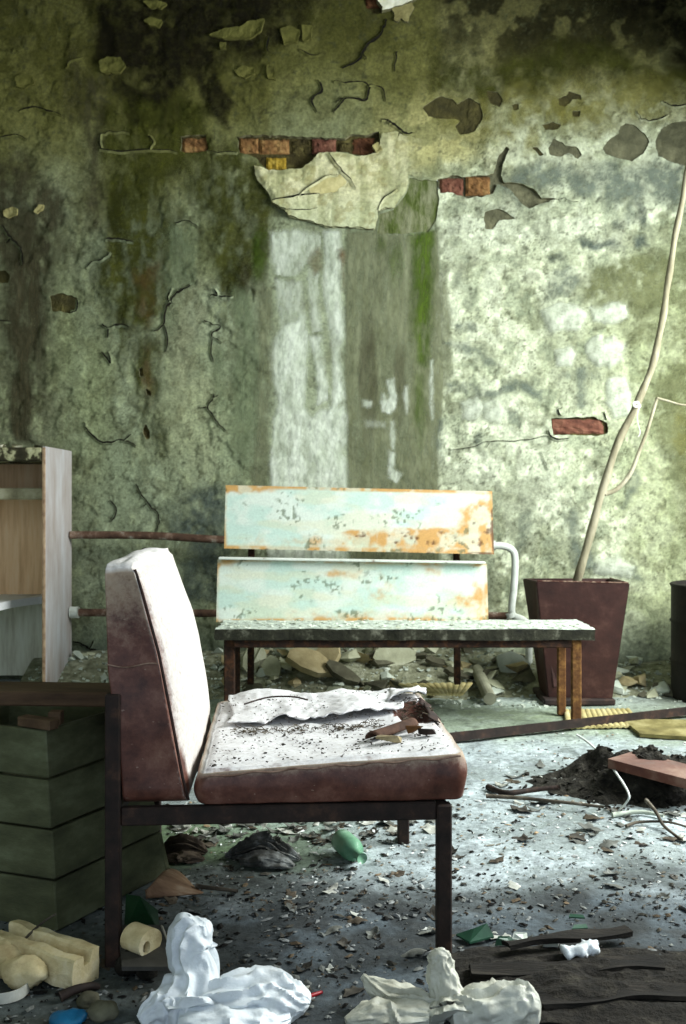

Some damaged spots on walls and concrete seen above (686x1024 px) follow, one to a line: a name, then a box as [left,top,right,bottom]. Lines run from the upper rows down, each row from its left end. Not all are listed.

leakage [97,0,308,128]
crack [264,19,415,137]
peeling [236,131,557,234]
flaking render [423,91,519,135]
leakage [432,0,686,102]
flaking render [603,121,686,166]
crack [99,283,234,366]
leakage [234,231,541,490]
crack [84,421,136,448]
crack [200,394,226,432]
flaking render [551,417,608,436]
leakage [268,549,439,560]